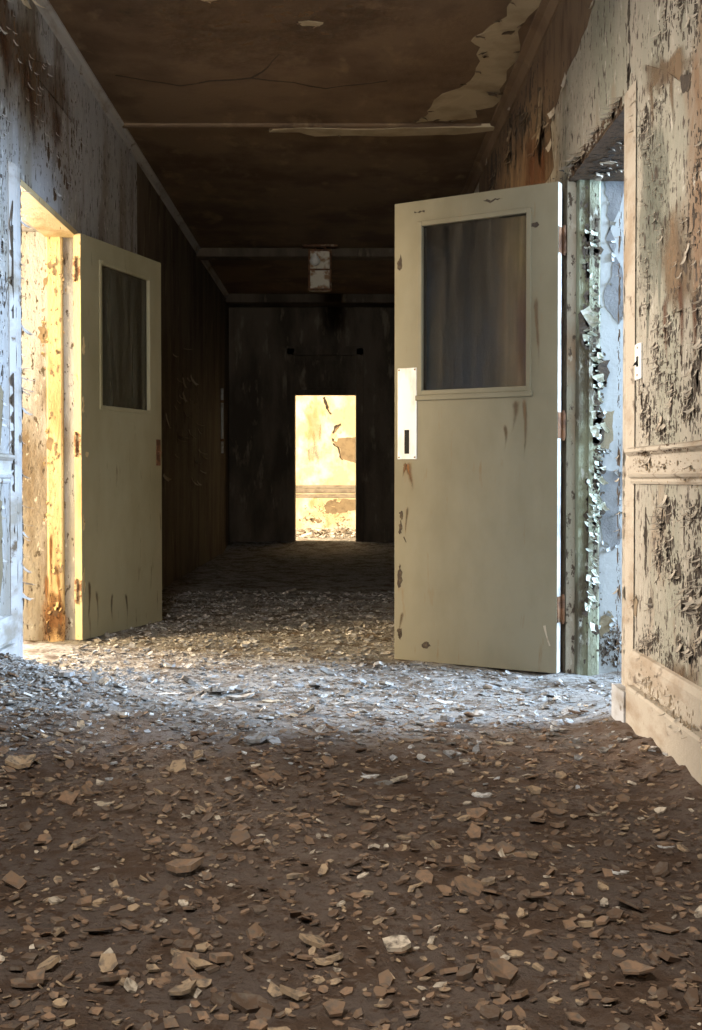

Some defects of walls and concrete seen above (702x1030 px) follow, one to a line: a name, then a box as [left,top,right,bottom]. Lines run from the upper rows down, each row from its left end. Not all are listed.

water stain [0,0,64,141]
peeling [0,0,88,450]
peeling [22,407,73,641]
peeling [267,0,702,739]